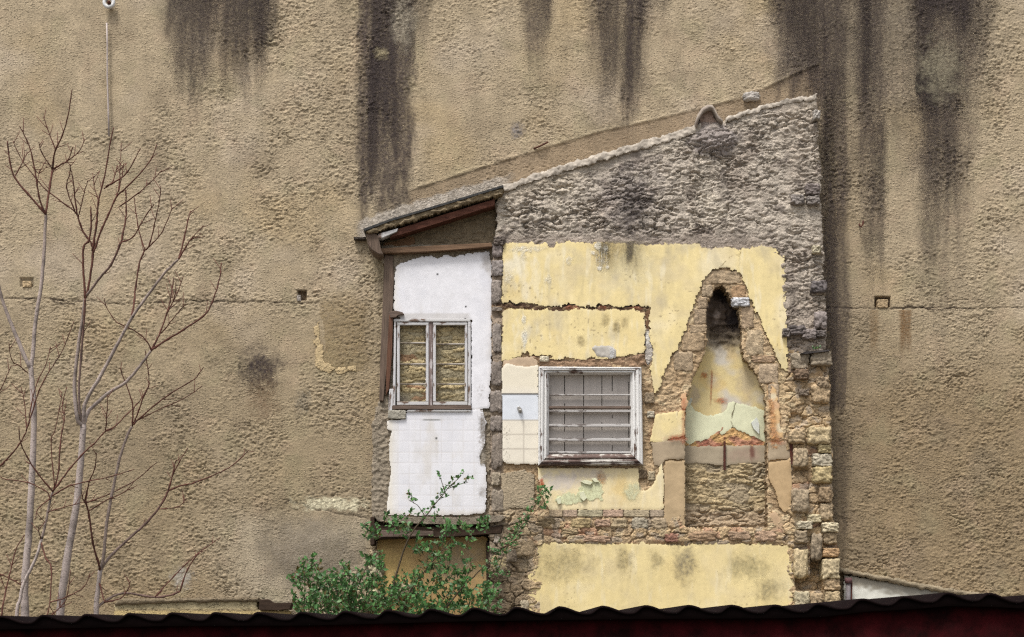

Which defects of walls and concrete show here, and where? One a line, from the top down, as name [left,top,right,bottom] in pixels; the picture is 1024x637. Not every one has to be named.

leakage [597,0,645,100]
leakage [357,0,415,216]
leakage [774,0,882,410]
spalling [522,316,647,367]
peeling [684,398,766,447]